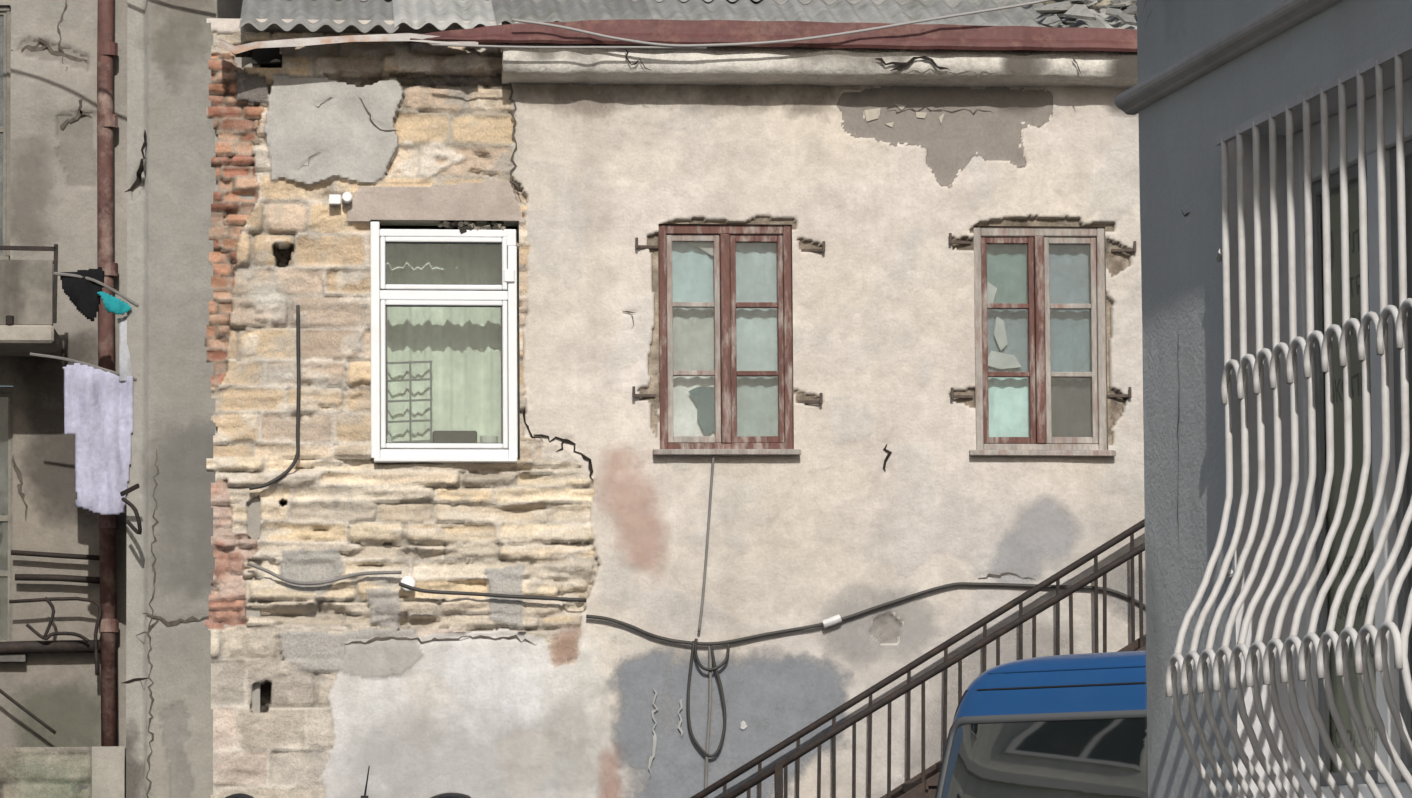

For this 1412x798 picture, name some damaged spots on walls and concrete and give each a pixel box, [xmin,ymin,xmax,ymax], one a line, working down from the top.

peeling [18,37,88,71]
crack [125,131,147,192]
flaking render [206,53,263,387]
peeling [837,86,1053,188]
crack [523,409,594,482]
crack [121,449,209,798]
flaking render [204,480,258,628]
leakage [613,649,845,798]